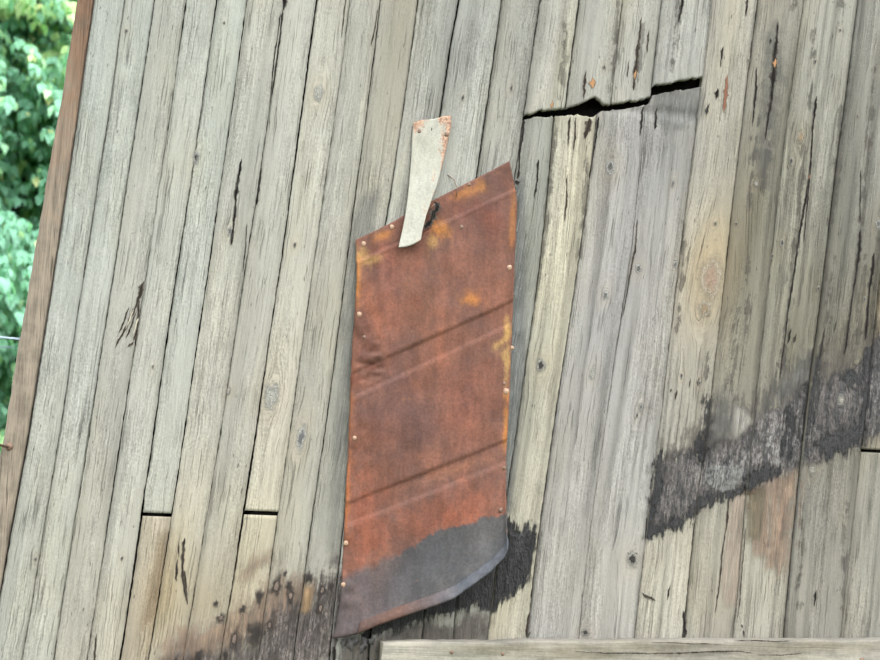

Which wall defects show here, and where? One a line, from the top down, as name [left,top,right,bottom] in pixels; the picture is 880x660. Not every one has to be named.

crack [515,16,719,198]
crack [622,220,638,316]
damp [743,365,806,489]
damp [813,421,861,461]
damp [834,369,865,391]
damp [646,449,667,530]